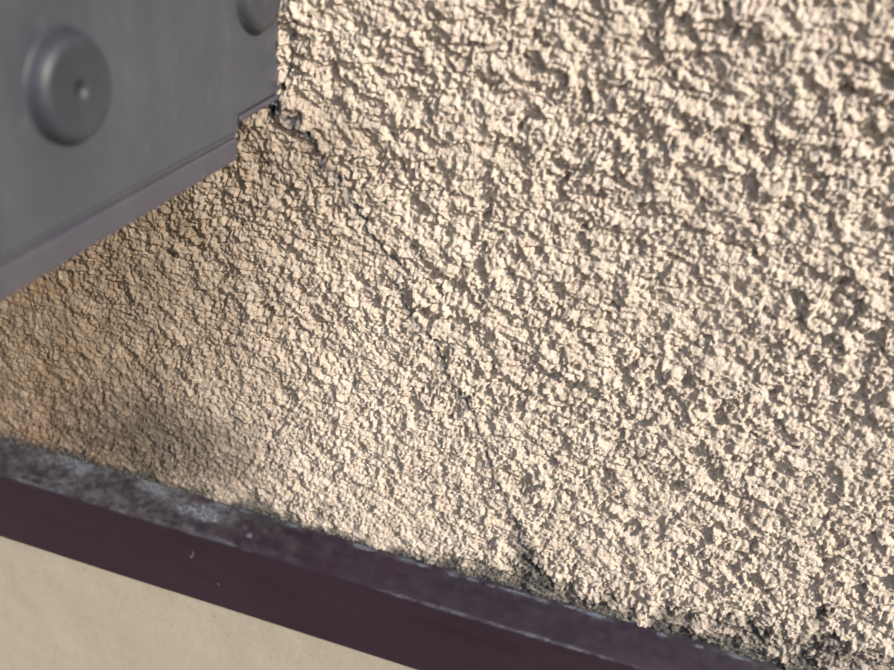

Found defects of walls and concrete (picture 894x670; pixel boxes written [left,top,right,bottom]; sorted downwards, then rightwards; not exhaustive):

crack [276,0,546,596]
damp [223,497,371,548]
damp [390,548,635,623]
damp [652,608,863,670]